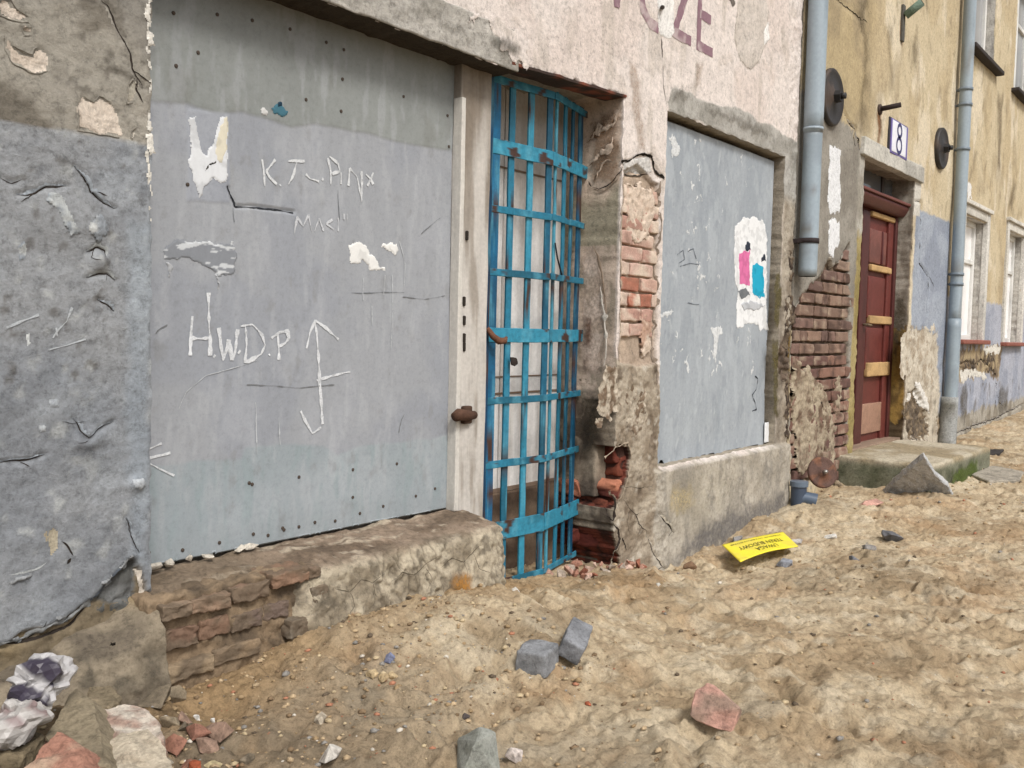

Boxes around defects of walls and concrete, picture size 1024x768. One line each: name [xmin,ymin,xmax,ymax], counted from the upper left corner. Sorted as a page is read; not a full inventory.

flaking render [0,0,48,74]
crack [101,0,150,102]
peeling [126,0,155,104]
crack [1,165,115,209]
flaking render [77,96,156,221]
flaking render [558,113,723,506]
flaking render [781,242,854,480]
peeling [899,323,940,440]
peeling [959,344,1001,384]
spalling [557,520,600,547]
crack [604,486,675,569]